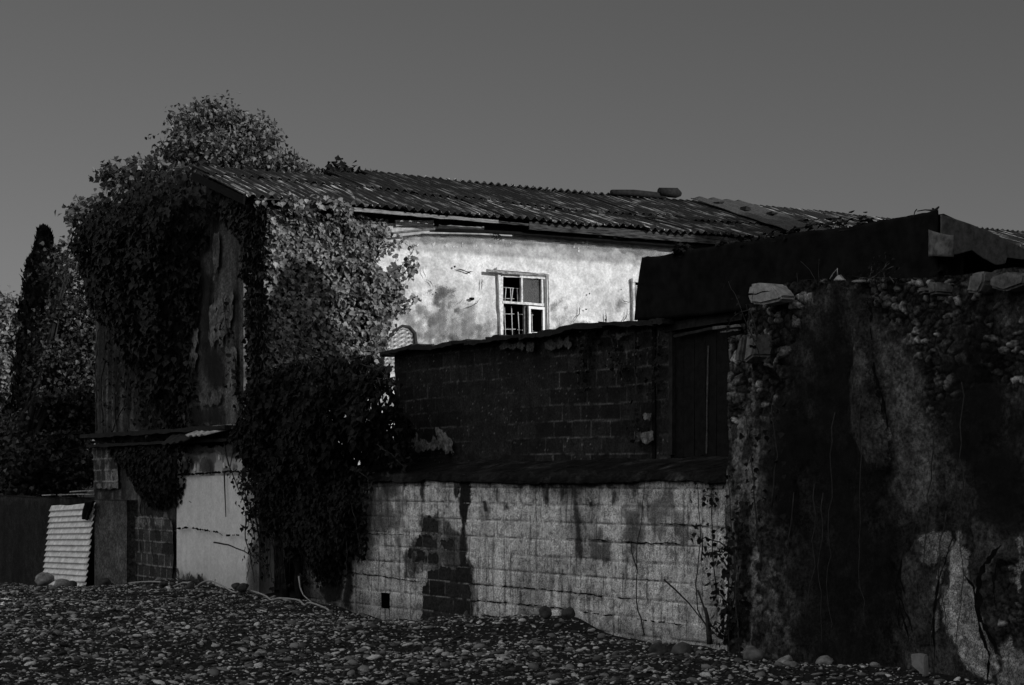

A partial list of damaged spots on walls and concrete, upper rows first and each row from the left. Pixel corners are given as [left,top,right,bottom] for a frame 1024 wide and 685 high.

peeling [176,232,239,423]
leakage [399,286,499,345]
leakage [404,473,498,615]
leakage [518,470,633,561]
crack [895,537,1001,684]